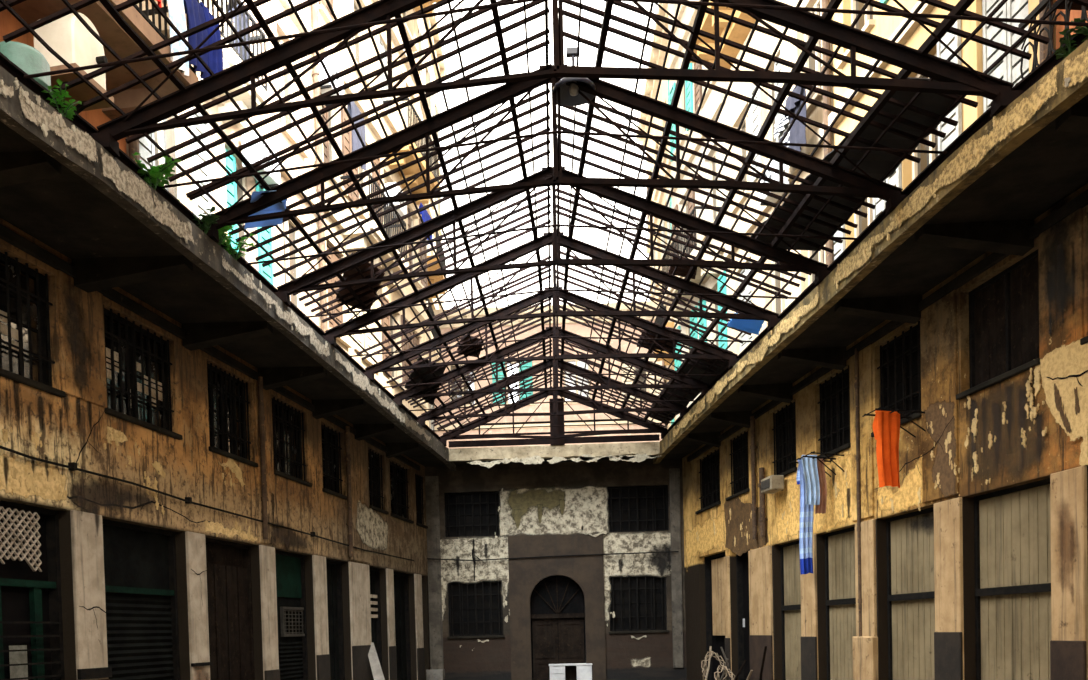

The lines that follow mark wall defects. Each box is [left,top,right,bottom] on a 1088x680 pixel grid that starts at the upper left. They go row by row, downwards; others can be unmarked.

spalling [0,78,194,244]
water stain [6,289,92,441]
peeling [1026,340,1088,466]
water stain [70,480,156,532]
peeling [440,486,671,626]
flaking render [686,478,800,567]